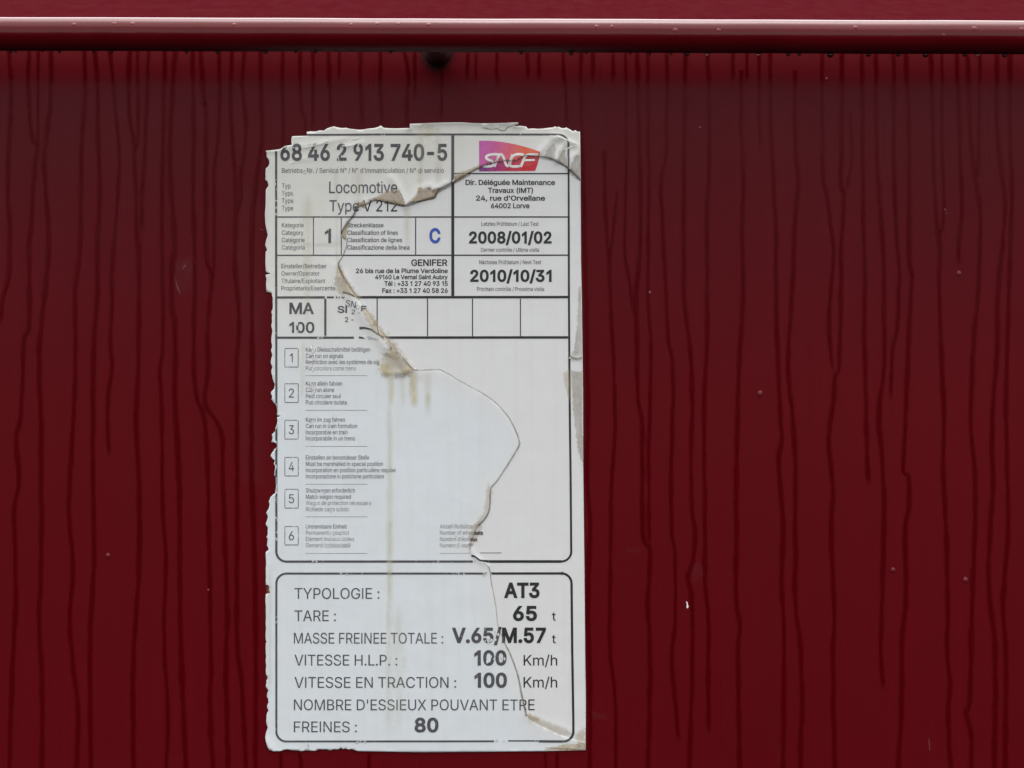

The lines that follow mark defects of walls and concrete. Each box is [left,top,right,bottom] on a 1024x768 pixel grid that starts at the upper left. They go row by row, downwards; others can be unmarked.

damp [8,158,51,768]
damp [67,119,120,768]
damp [131,121,146,768]
damp [158,140,188,768]
damp [191,141,260,768]
damp [544,239,592,768]
damp [604,201,711,768]
damp [734,204,745,768]
damp [773,196,804,768]
damp [827,222,844,768]
damp [862,209,914,768]
damp [964,210,1013,768]